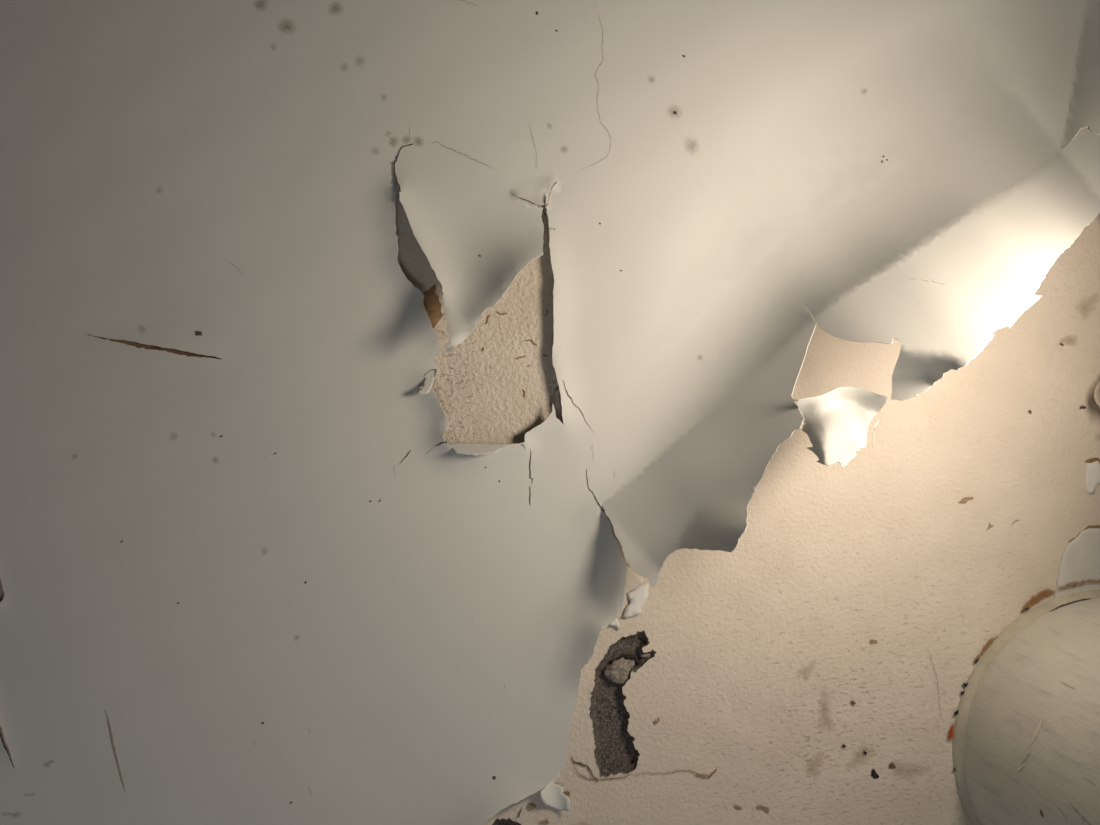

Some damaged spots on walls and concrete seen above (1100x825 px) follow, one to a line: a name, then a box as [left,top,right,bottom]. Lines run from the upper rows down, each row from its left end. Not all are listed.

crack [391,144,413,192]
peeling [395,188,563,456]
crack [87,334,221,359]
peeling [484,213,1100,825]
crack [0,579,8,602]
crack [0,726,14,767]